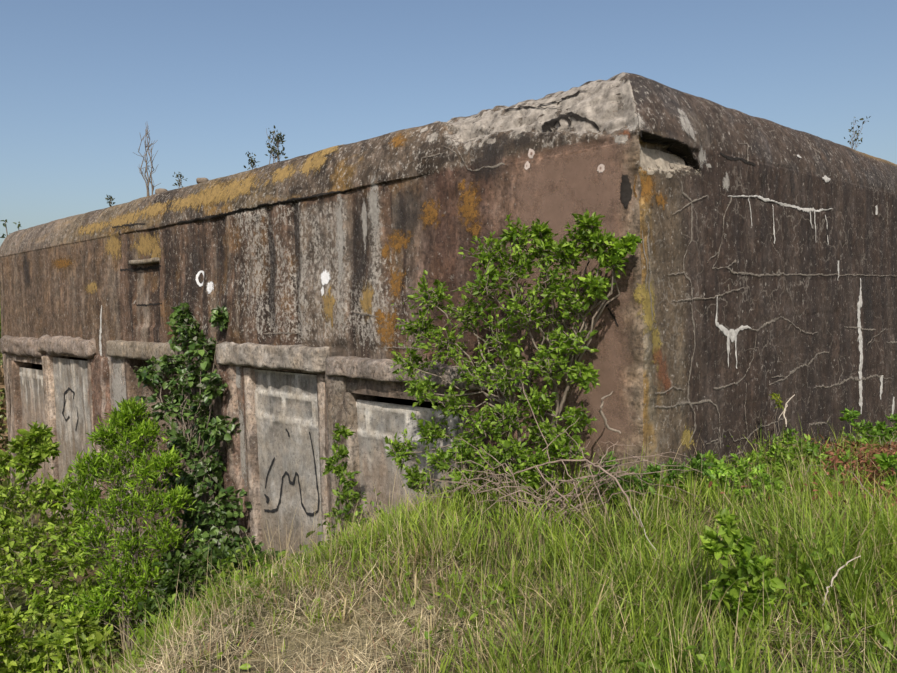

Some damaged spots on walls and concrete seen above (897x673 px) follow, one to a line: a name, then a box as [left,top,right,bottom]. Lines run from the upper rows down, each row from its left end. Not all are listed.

crack [504,90,600,133]
spalling [677,109,695,139]
spalling [639,144,711,178]
leakage [336,178,380,283]
crack [640,130,897,458]